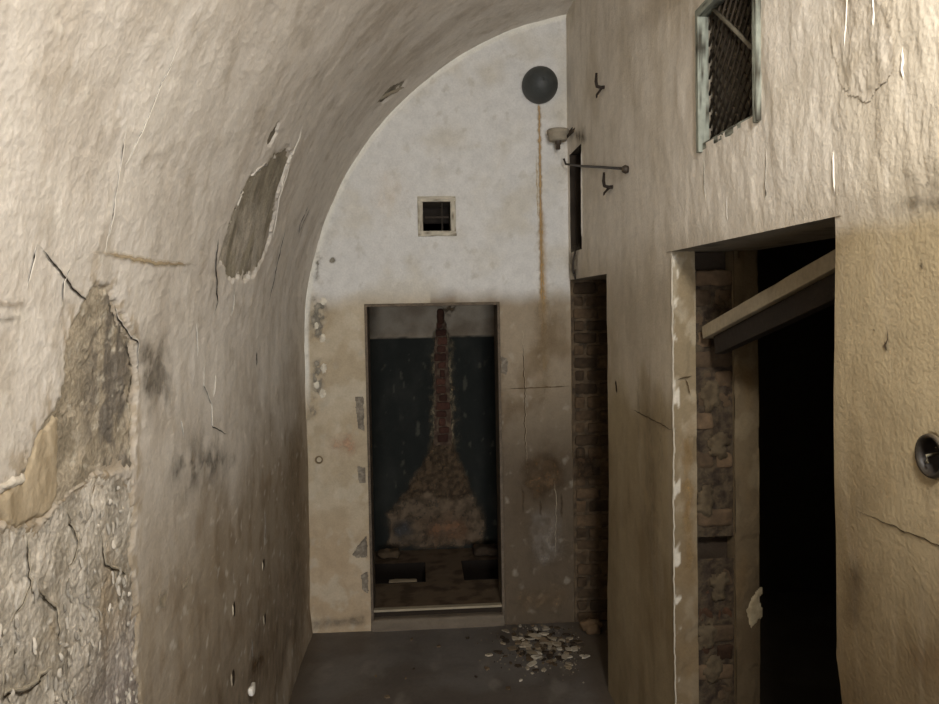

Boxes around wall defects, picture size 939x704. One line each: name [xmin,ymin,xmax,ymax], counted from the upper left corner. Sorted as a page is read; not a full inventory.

crack [105,45,180,254]
flaking render [219,122,305,279]
corrosion [536,106,545,299]
peeling [143,341,167,394]
flaking render [0,285,140,704]
crack [843,504,939,546]